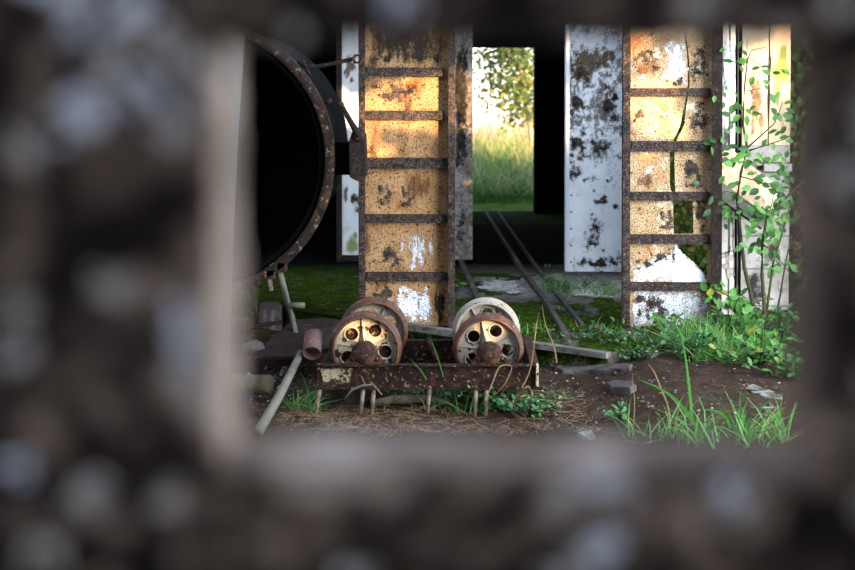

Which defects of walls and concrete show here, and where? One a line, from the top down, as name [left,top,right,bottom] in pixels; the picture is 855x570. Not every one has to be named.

peeling [664,44,688,87]
peeling [400,232,434,270]
peeling [396,285,432,323]
peeling [630,244,709,327]